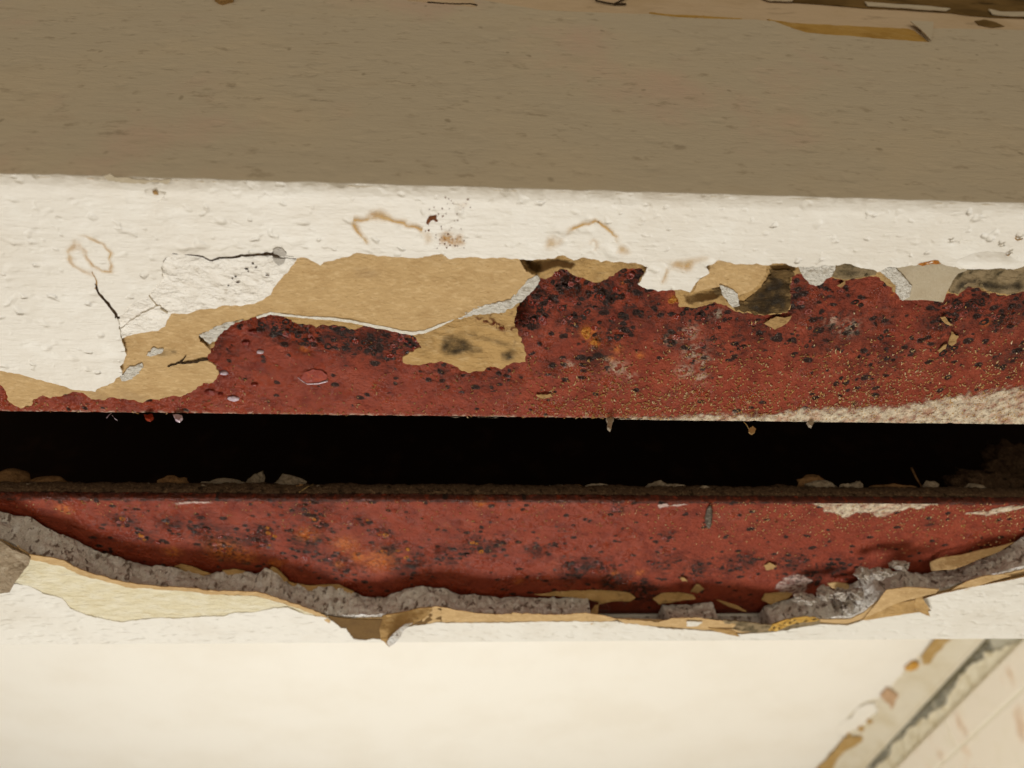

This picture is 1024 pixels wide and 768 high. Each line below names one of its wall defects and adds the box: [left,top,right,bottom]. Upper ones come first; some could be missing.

damp [353,215,423,241]
crack [173,247,296,266]
crack [92,272,120,319]
peeling [0,253,647,408]
rust [258,319,418,358]
rust [514,268,644,345]
rust [667,295,732,347]
peeling [674,260,1024,315]
rust [945,298,1016,329]
peeling [15,545,330,623]
peeling [923,576,1024,611]